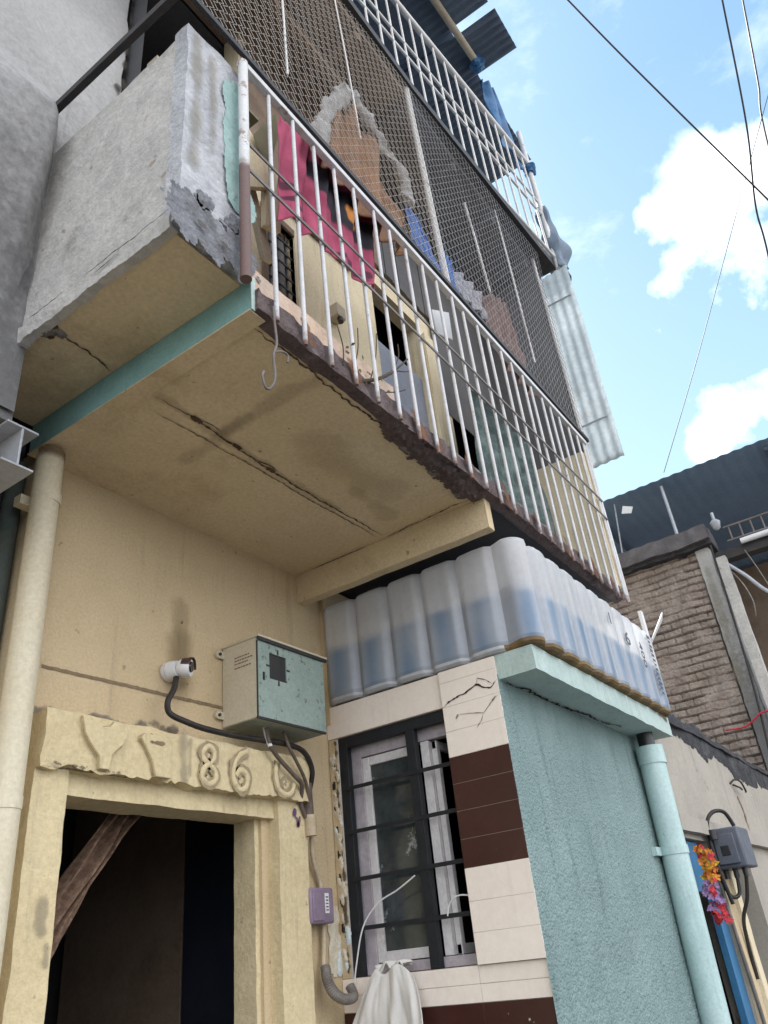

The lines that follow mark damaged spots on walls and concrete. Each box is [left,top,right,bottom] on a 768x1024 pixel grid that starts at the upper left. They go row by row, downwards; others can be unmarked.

spalling [160,79,261,284]
crack [86,209,168,274]
crack [27,293,110,371]
crack [153,395,468,568]
spalling [379,410,487,502]
crack [442,678,621,727]
peeling [328,741,352,977]